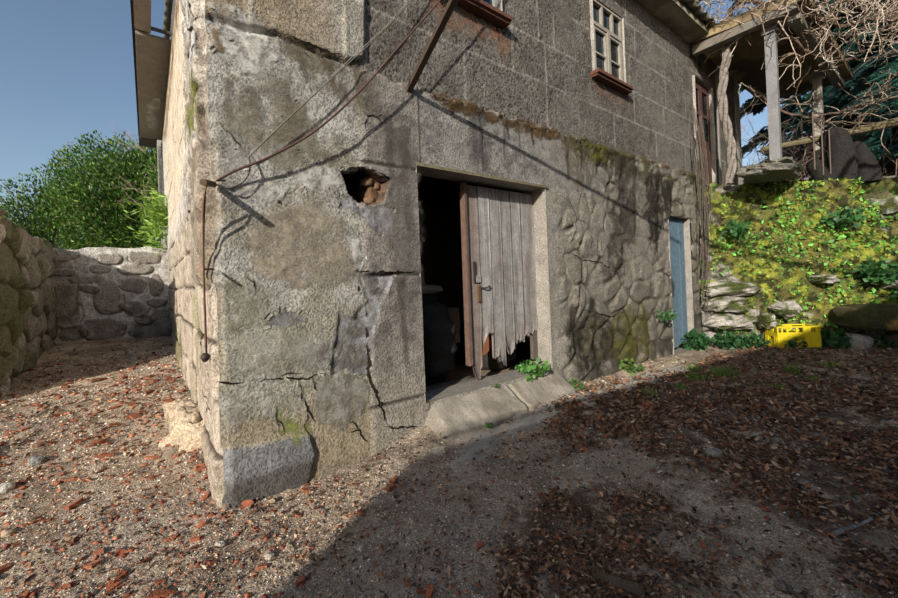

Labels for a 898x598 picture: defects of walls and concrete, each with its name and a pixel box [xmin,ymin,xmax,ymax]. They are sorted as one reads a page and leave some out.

corrosion [433,0,510,59]
crack [202,372,326,438]
spalling [237,162,397,430]
crack [356,270,417,430]